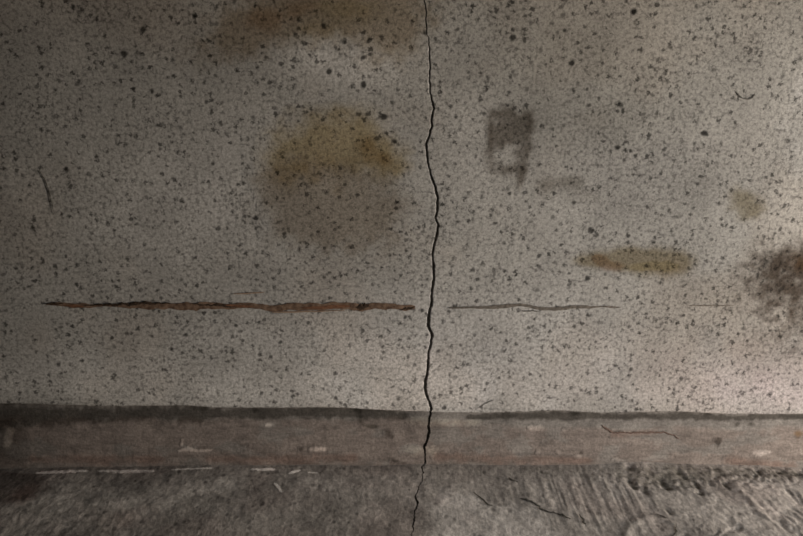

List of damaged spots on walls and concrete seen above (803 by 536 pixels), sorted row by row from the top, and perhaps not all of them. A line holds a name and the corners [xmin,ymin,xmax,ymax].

damp [481,101,604,208]
damp [720,181,771,225]
damp [770,56,803,180]
corrosion [46,292,415,313]
crack [411,0,621,536]
corrosion [565,241,703,283]
damp [722,231,803,362]